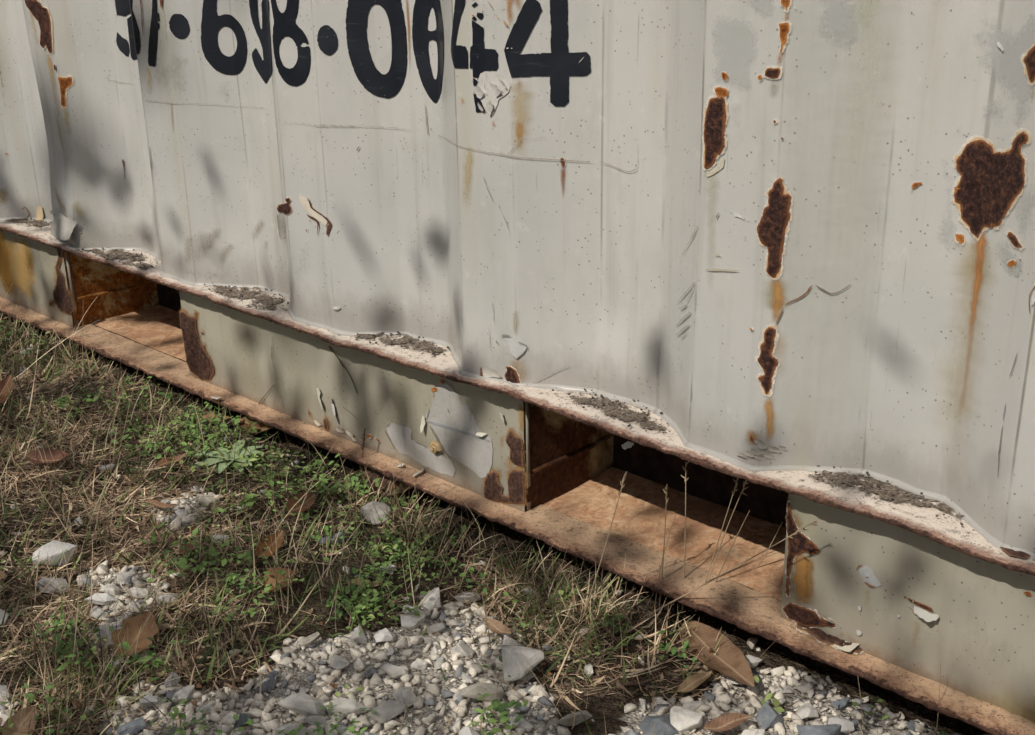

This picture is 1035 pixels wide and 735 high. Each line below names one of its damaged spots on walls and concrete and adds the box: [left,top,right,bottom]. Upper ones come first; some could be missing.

corrosion [24,0,74,122]
corrosion [1020,44,1035,85]
corrosion [702,71,729,177]
corrosion [951,128,1031,324]
corrosion [180,309,215,381]
corrosion [750,177,793,435]
peeling [367,379,493,478]
corrosion [483,406,527,506]
corrosion [783,497,863,653]
peeling [856,565,882,588]
peeling [897,596,939,622]